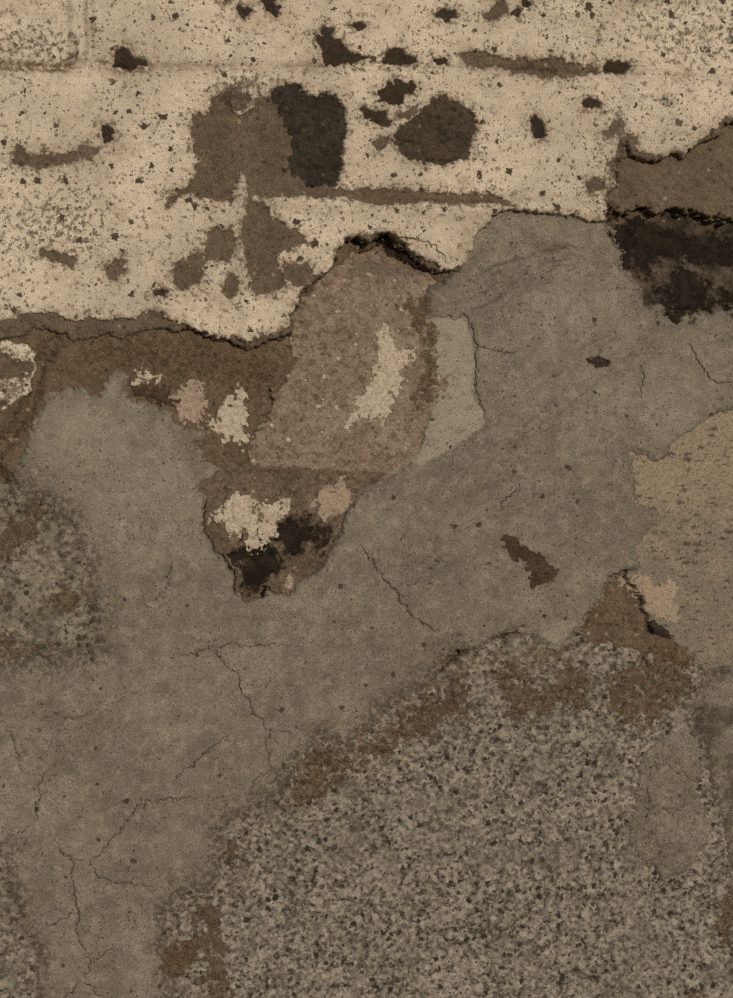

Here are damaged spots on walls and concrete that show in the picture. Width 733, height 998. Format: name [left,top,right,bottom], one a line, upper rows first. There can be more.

peeling [313,33,369,67]
peeling [382,48,419,66]
peeling [11,125,115,170]
peeling [165,79,517,299]
water stain [651,265,733,325]
crack [443,313,522,422]
spalling [199,462,386,602]
crack [362,546,443,632]
spalling [500,535,558,590]
crack [171,643,302,795]
crack [7,736,46,836]
crack [19,736,226,998]